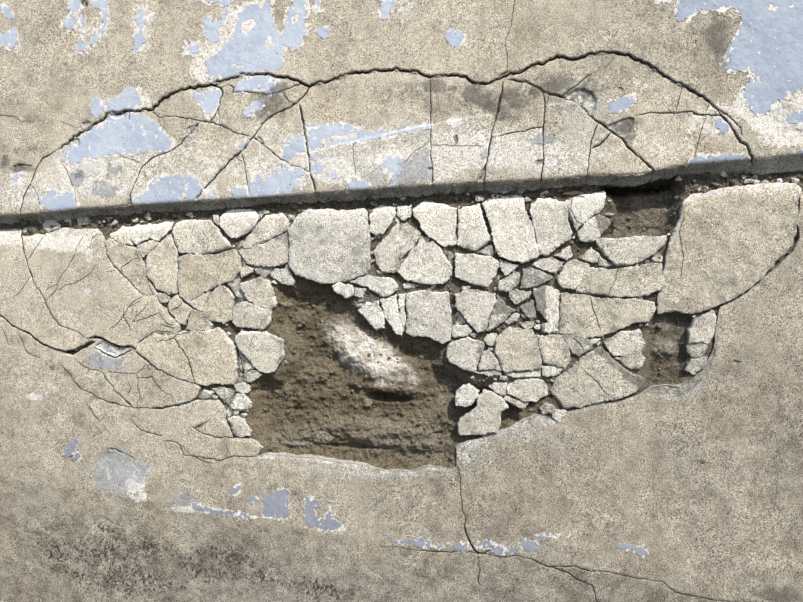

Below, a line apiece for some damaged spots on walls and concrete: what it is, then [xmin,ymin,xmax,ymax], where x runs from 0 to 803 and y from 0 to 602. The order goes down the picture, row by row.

peeling [58,0,110,55]
peeling [181,0,332,120]
peeling [654,0,803,124]
peeling [39,86,177,212]
peeling [127,118,434,205]
crack [0,0,754,466]
spalling [599,175,687,241]
peeling [686,150,751,165]
spalling [245,278,557,476]
spalling [642,312,716,399]
peeling [384,532,558,556]
crack [383,467,730,602]